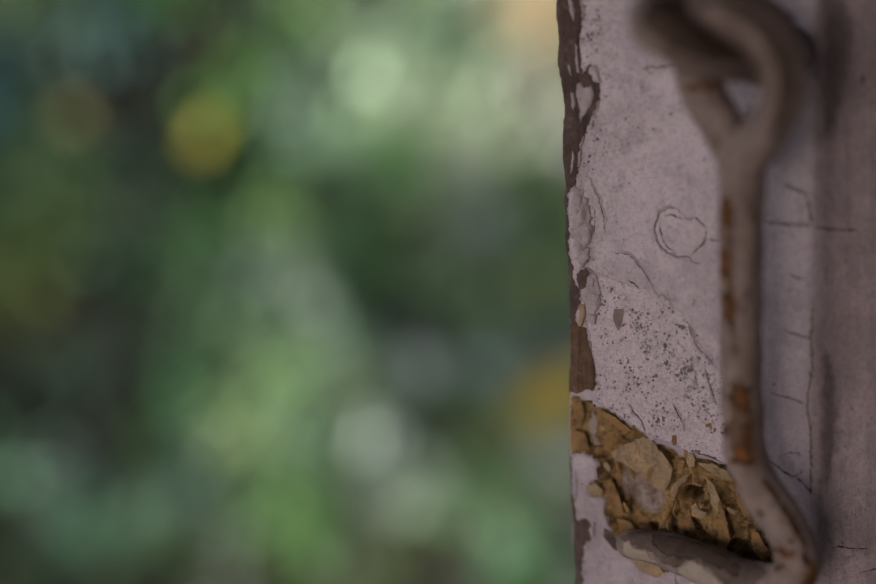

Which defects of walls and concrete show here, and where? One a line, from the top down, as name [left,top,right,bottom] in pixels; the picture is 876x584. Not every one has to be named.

crack [589,176,608,233]
spalling [556,0,774,584]
crack [616,251,721,405]
crack [652,204,719,265]
rust [719,197,737,330]
crack [764,183,858,232]
rust [722,381,755,488]
rust [762,478,818,584]